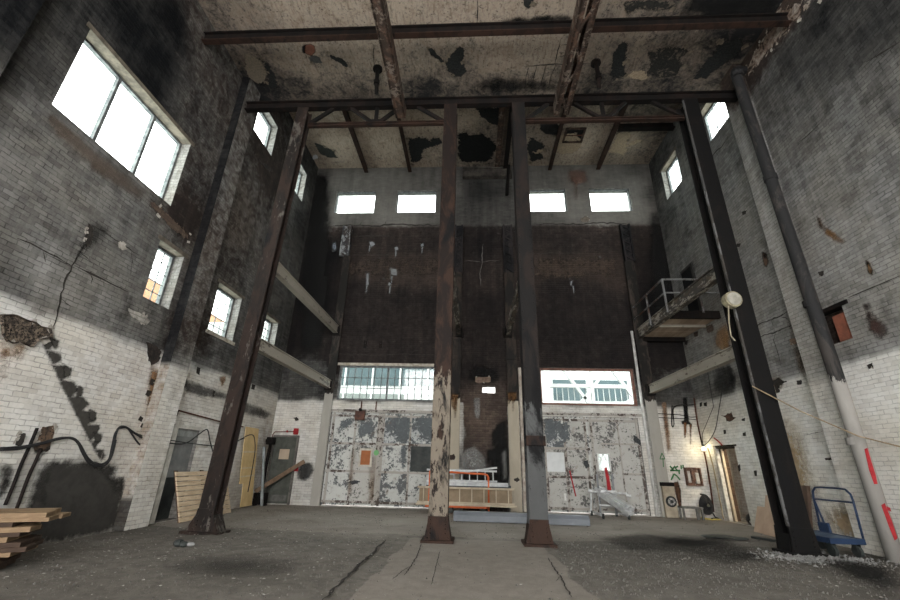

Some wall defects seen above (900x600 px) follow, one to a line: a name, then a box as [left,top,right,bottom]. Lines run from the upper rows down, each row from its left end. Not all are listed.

spalling [426,43,467,77]
peeling [693,0,822,80]
spalling [406,135,443,166]
spalling [457,108,499,164]
crack [17,226,138,327]
spalling [0,314,55,349]
peeling [337,416,375,441]
peeling [391,414,432,472]
peeling [543,417,572,445]
crack [322,540,386,600]